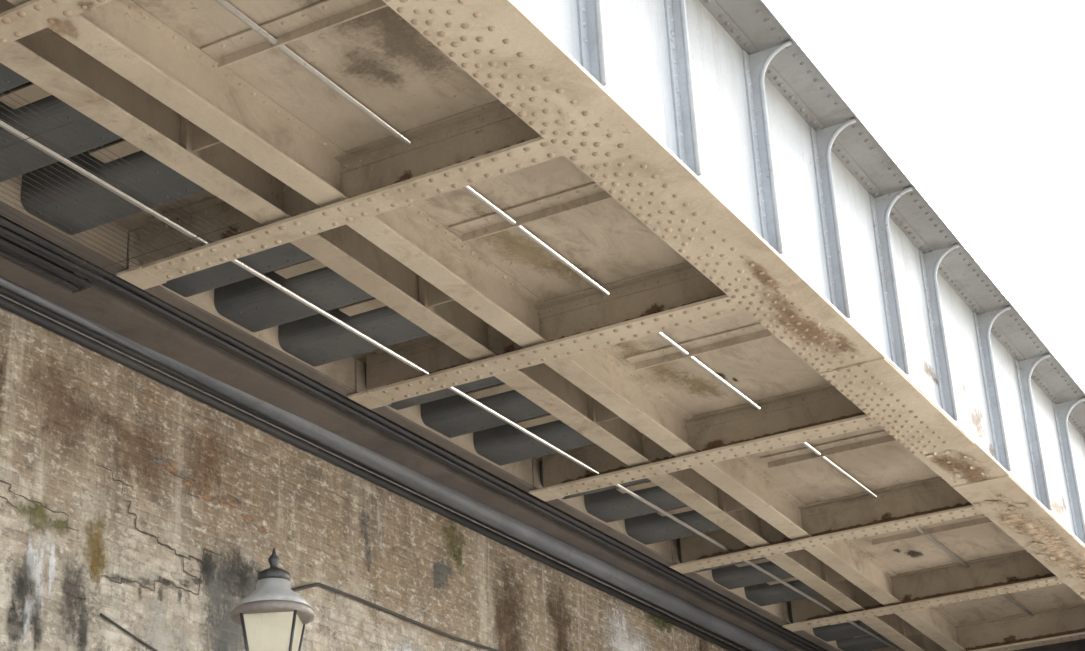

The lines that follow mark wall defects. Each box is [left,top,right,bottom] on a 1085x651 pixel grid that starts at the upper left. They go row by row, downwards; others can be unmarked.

rust [751,262,855,353]
rust [926,446,986,483]
crack [0,480,78,531]
crack [96,438,223,584]
leakage [8,522,106,651]
leakage [205,551,257,651]
leakage [495,574,522,651]
leakage [548,588,570,651]
rust [696,546,752,560]
rust [806,611,848,621]
rust [810,496,1085,604]